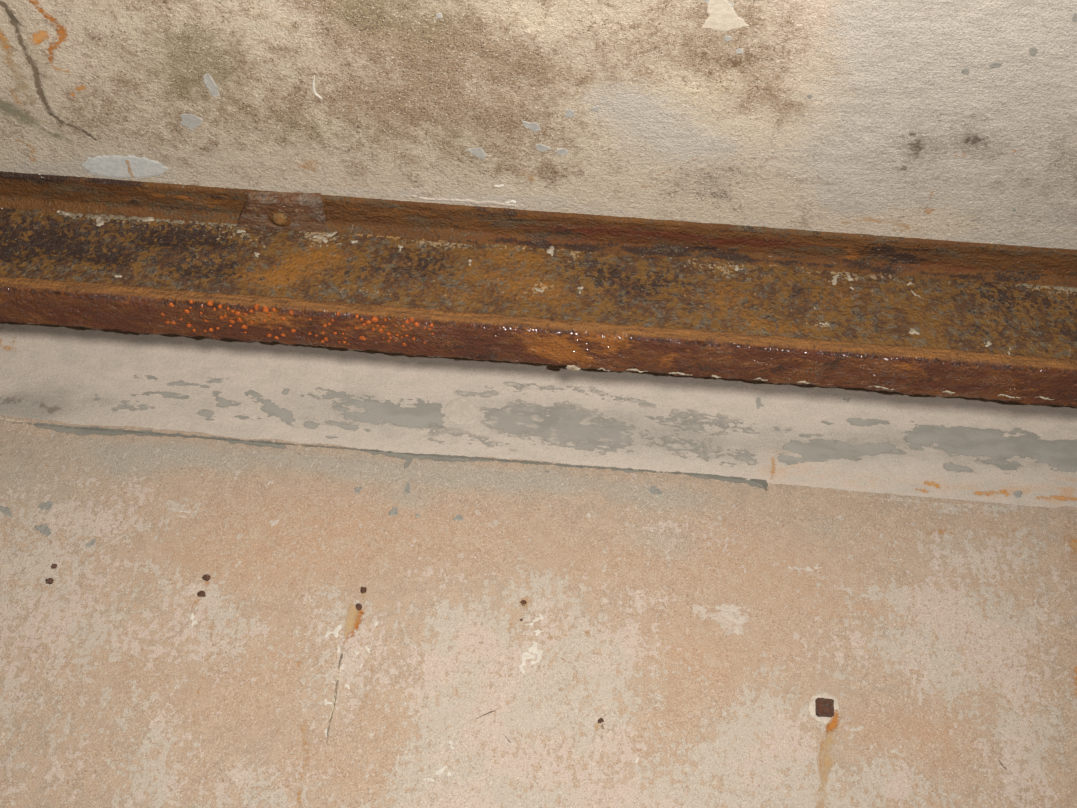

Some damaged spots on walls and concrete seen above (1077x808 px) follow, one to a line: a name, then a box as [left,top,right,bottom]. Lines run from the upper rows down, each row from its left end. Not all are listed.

corrosion [30,0,68,72]
crack [0,1,96,140]
peeling [203,73,220,98]
peeling [521,119,569,156]
corrosion [160,300,434,346]
peeling [113,375,759,467]
peeling [847,418,890,426]
peeling [775,421,1077,474]
corrosion [344,605,364,638]
corrosion [820,710,839,782]